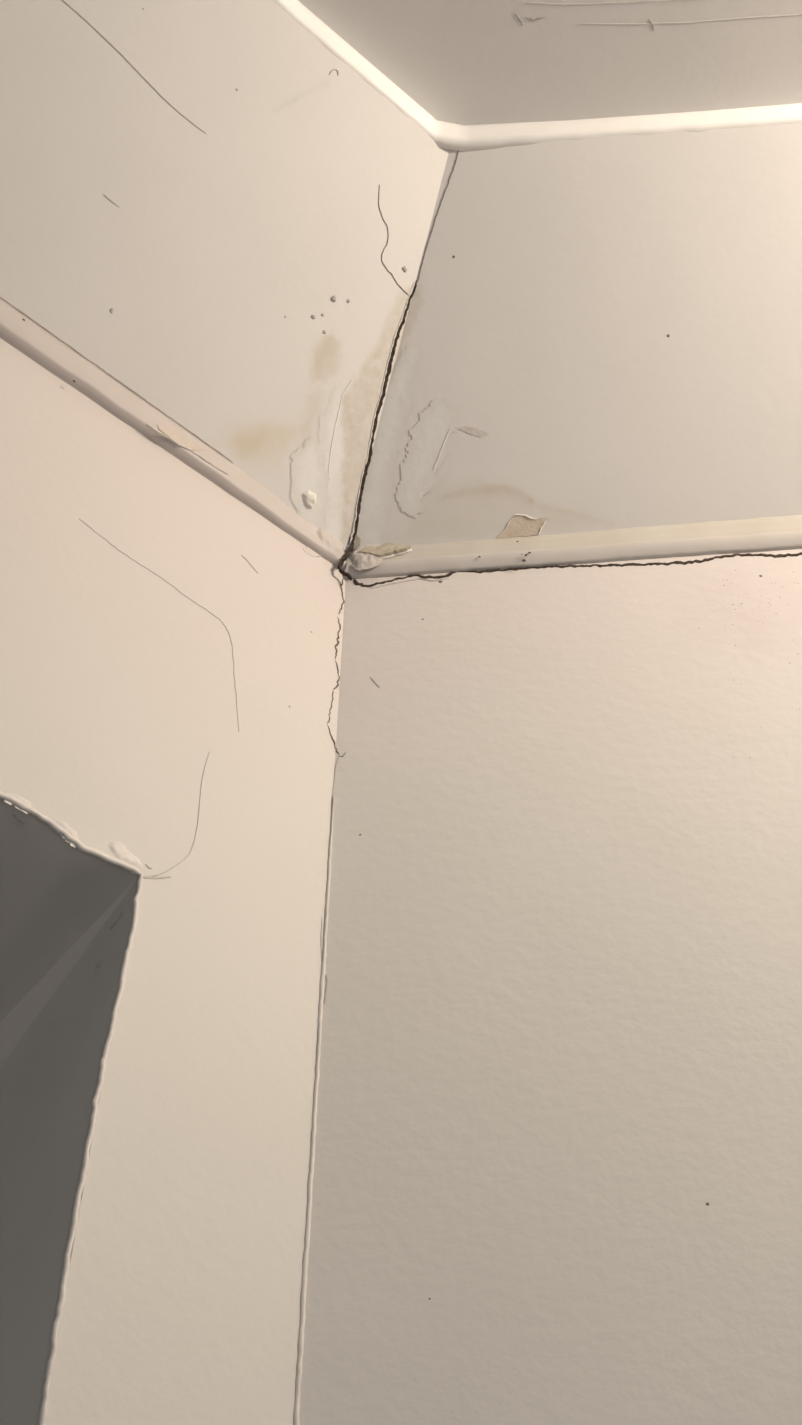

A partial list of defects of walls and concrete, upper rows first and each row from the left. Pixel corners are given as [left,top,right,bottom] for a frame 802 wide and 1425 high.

crack [327,151,802,802]
crack [320,921,328,1004]